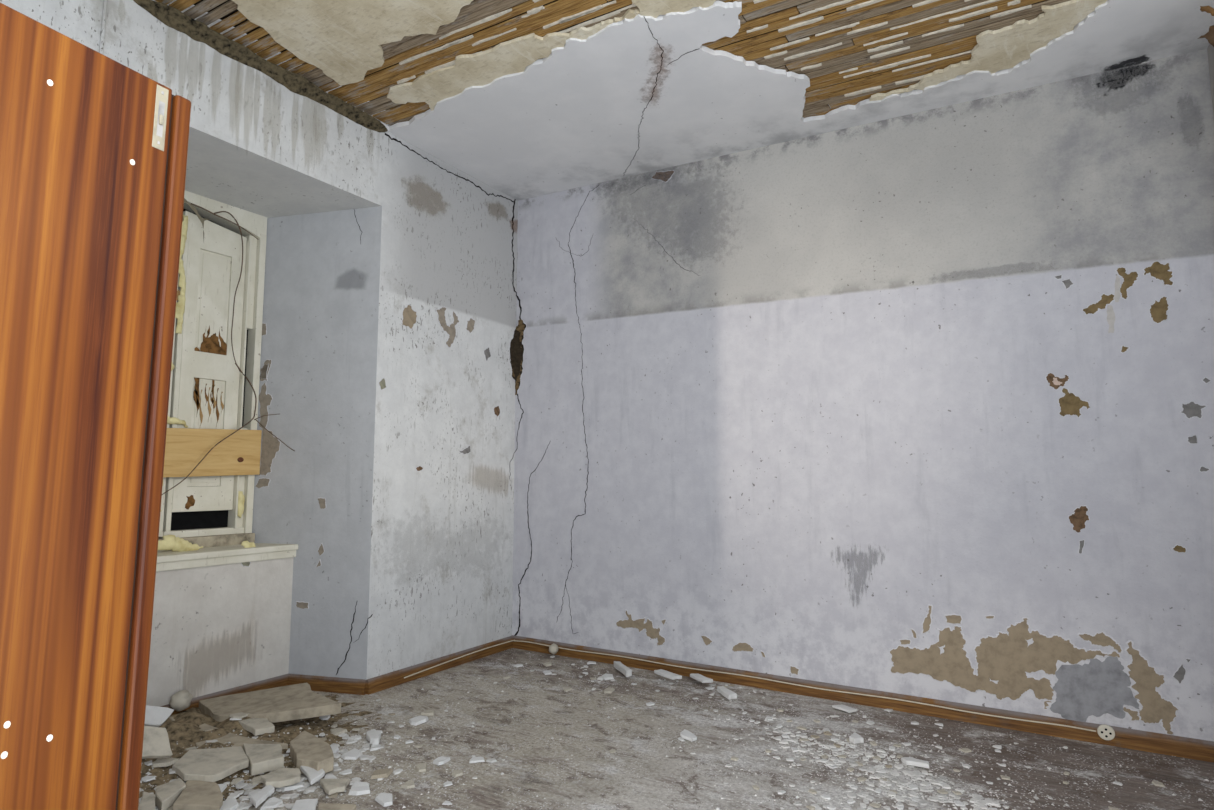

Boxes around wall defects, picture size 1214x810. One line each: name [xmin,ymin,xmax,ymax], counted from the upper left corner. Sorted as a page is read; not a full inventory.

spalling [155,0,1107,126]
water stain [1096,55,1154,96]
crack [384,133,522,319]
peeling [401,305,417,329]
peeling [435,307,475,348]
crack [556,17,699,634]
peeling [1054,274,1074,290]
peeling [1082,261,1174,333]
peeling [1045,373,1091,418]
crack [509,394,550,636]
peeling [616,610,666,646]
peeling [888,604,1191,735]